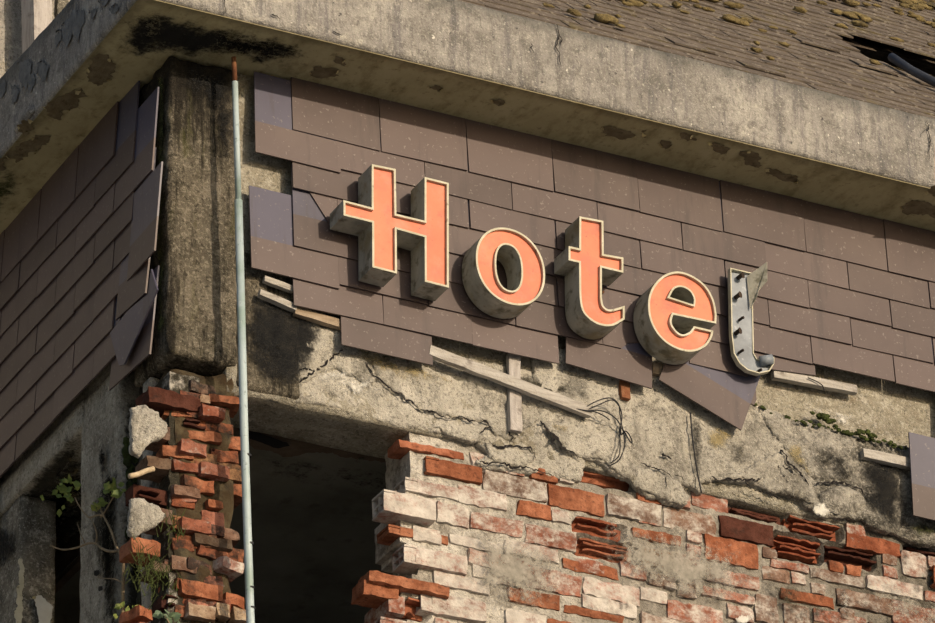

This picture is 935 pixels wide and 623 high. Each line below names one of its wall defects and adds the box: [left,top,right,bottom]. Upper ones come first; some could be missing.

water stain [122,16,298,155]
water stain [246,298,320,383]
crack [299,349,343,383]
peeling [129,405,168,458]
crack [366,362,578,476]
crack [643,453,684,483]
crack [711,450,866,499]
peeling [126,498,166,540]
water stain [0,528,25,623]